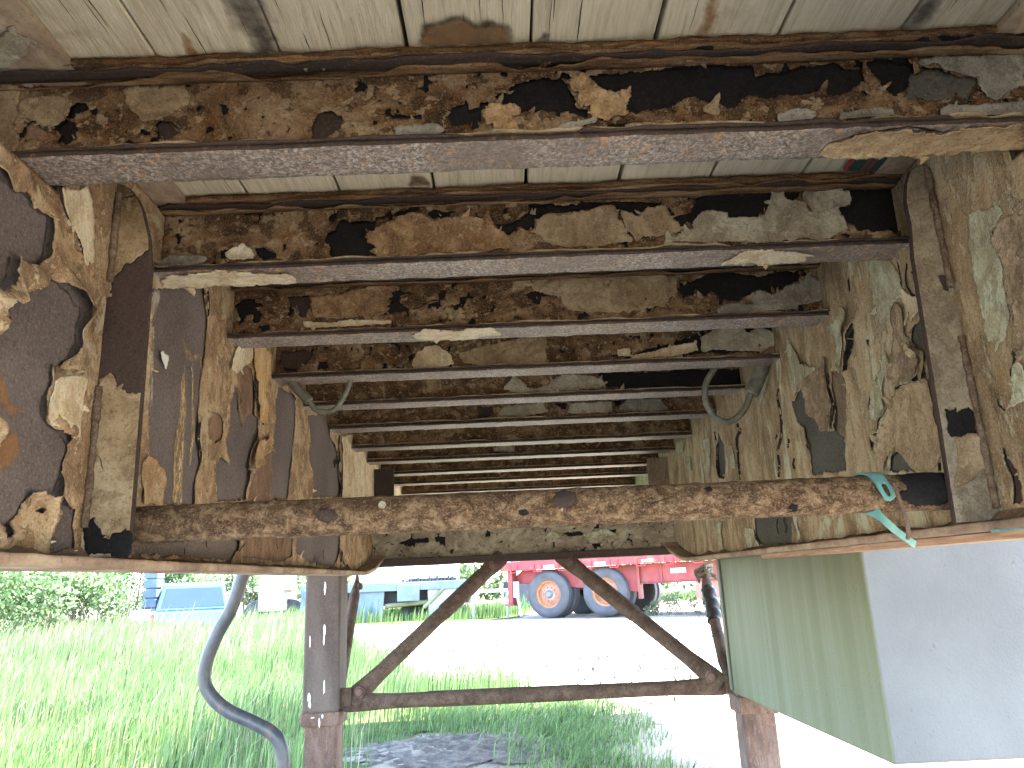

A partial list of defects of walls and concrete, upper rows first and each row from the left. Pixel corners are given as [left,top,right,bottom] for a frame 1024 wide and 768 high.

peeling [0,86,92,151]
peeling [447,61,597,130]
peeling [589,45,1024,127]
rust [817,123,1024,165]
peeling [0,177,96,285]
peeling [496,188,898,248]
peeling [678,271,822,314]
peeling [0,250,313,558]
peeling [477,368,741,418]
peeling [617,306,854,476]
peeling [308,414,376,523]
peeling [884,407,985,507]